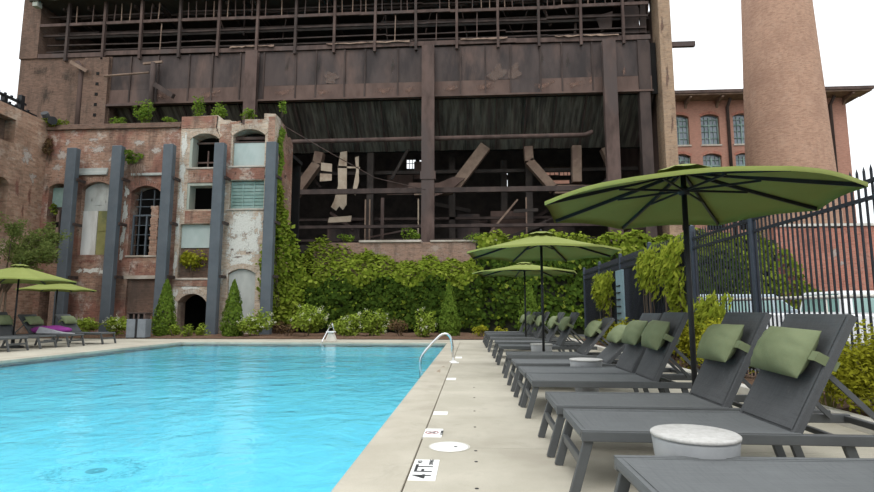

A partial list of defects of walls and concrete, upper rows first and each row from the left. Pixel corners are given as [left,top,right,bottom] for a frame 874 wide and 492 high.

peeling [220,211,263,285]